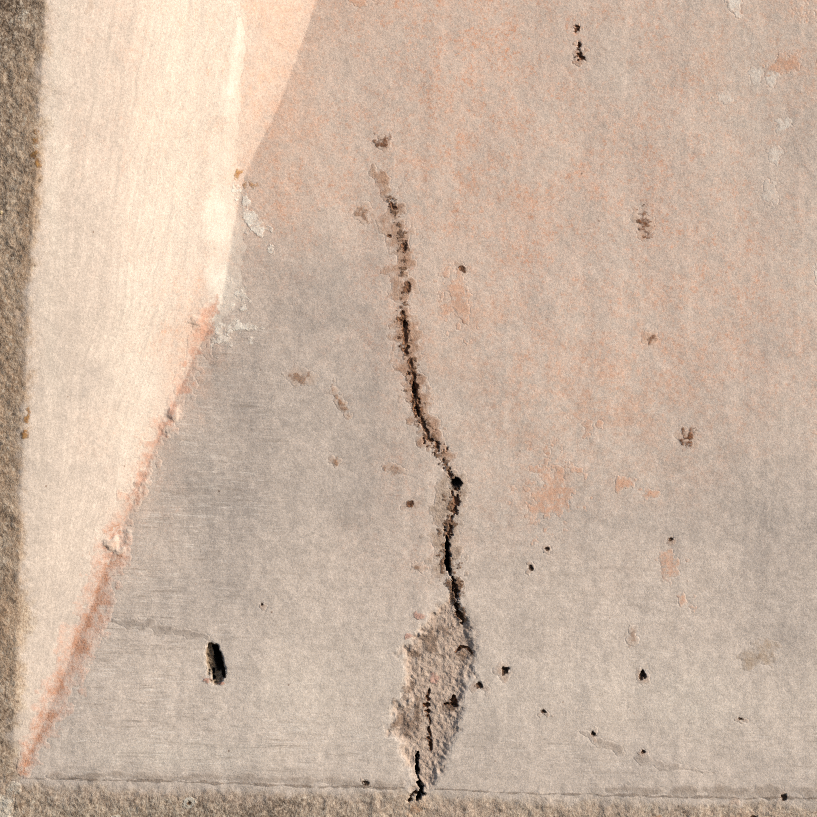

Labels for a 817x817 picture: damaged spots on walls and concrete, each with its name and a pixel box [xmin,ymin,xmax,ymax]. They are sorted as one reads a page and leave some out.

corrosion [16,293,220,779]
spalling [211,644,226,680]
crack [367,162,473,654]